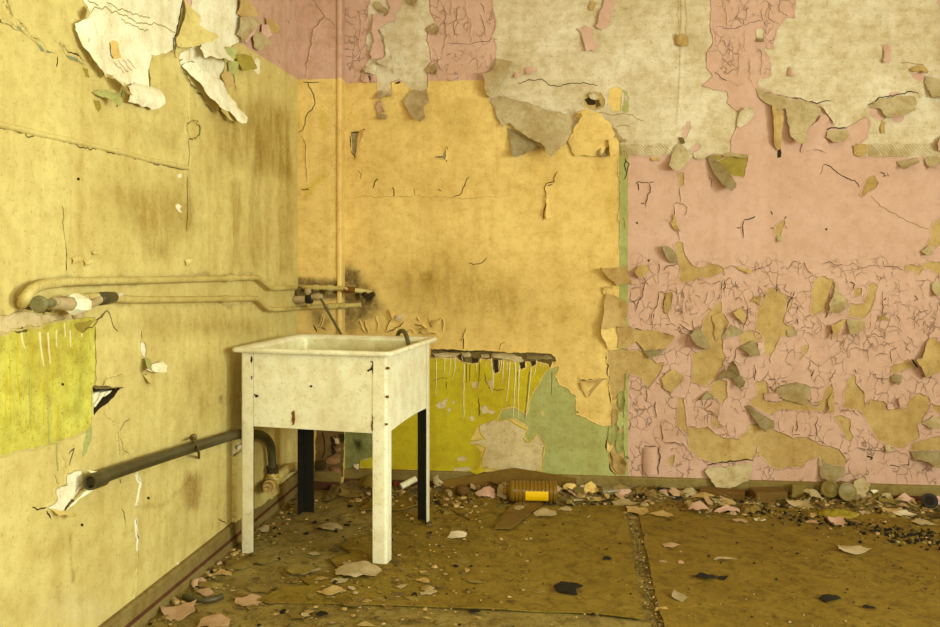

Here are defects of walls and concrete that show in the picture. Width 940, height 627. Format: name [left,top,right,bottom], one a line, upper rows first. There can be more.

peeling [0,0,280,124]
peeling [360,0,439,122]
crack [431,0,497,71]
peeling [482,0,940,513]
spalling [0,307,73,337]
damp [298,277,372,327]
spalling [93,385,125,407]
peeling [434,398,456,413]
spalling [453,404,545,474]
crack [625,259,940,467]
peeling [32,467,97,519]